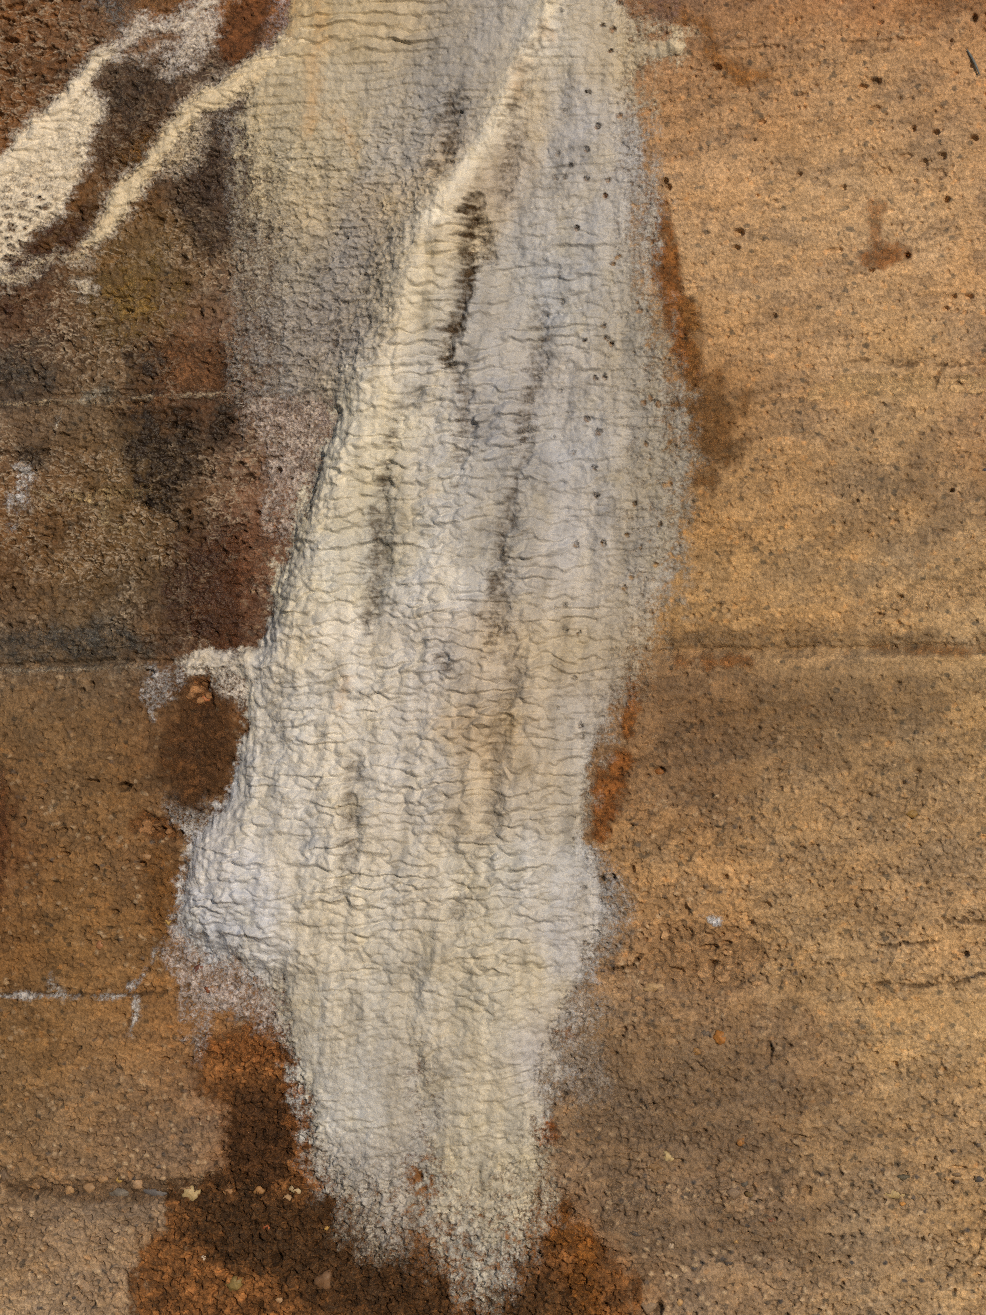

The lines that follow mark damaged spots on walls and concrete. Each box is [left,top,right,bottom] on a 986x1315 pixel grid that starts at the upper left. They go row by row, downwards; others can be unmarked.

corrosion [128,1025,643,1315]
leakage [0,0,777,1311]